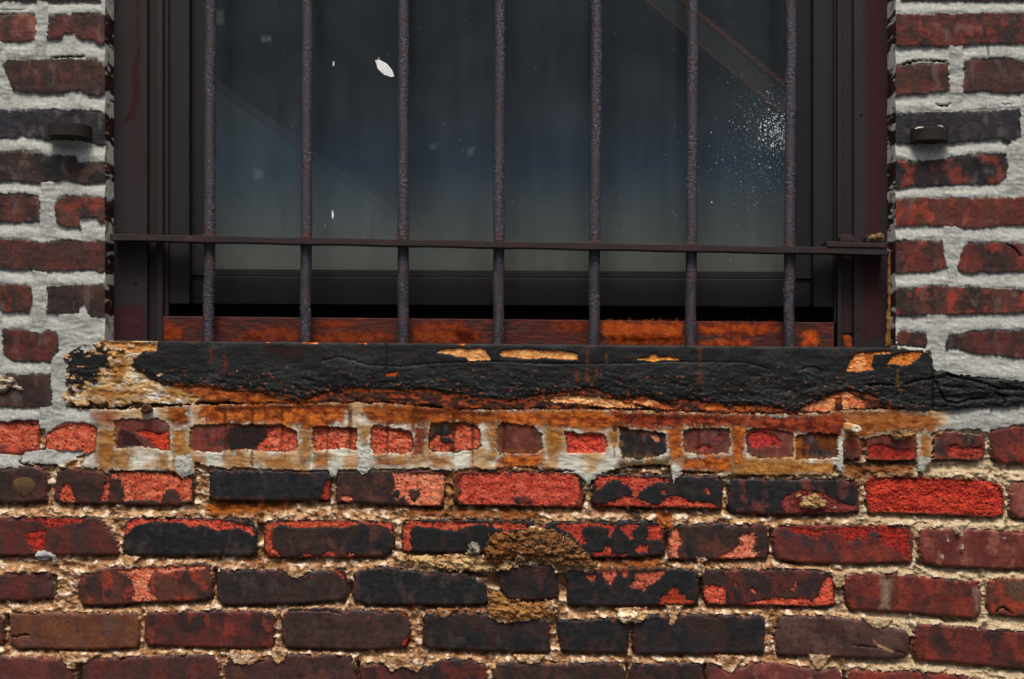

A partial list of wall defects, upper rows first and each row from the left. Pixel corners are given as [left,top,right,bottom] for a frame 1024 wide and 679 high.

rust [230,321,392,345]
rust [413,322,481,346]
rust [601,320,685,345]
rust [698,323,777,346]
rust [803,331,818,346]
peeling [847,351,921,372]
rust [92,361,143,400]
flaking render [0,336,897,454]
rust [93,413,134,470]
rust [158,385,938,520]